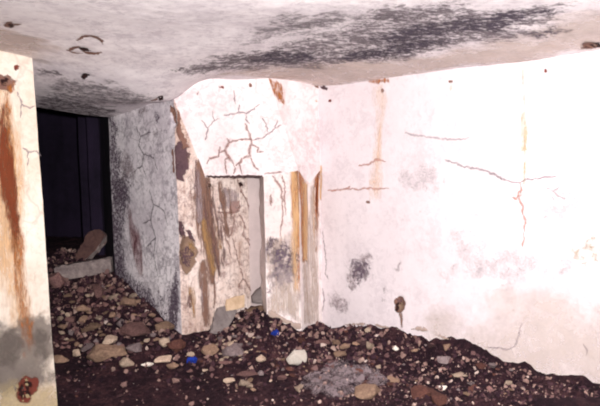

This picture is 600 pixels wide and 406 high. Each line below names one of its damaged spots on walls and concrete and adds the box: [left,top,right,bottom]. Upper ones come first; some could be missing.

leakage [175,3,597,84]
rust [269,79,285,104]
spalling [170,105,190,182]
crack [406,132,469,141]
rust [0,98,33,346]
crack [144,190,167,276]
crack [202,90,286,291]
leakage [265,184,318,321]
rust [290,166,322,288]
crack [328,185,389,193]
mould [347,255,372,290]
crack [447,160,564,247]